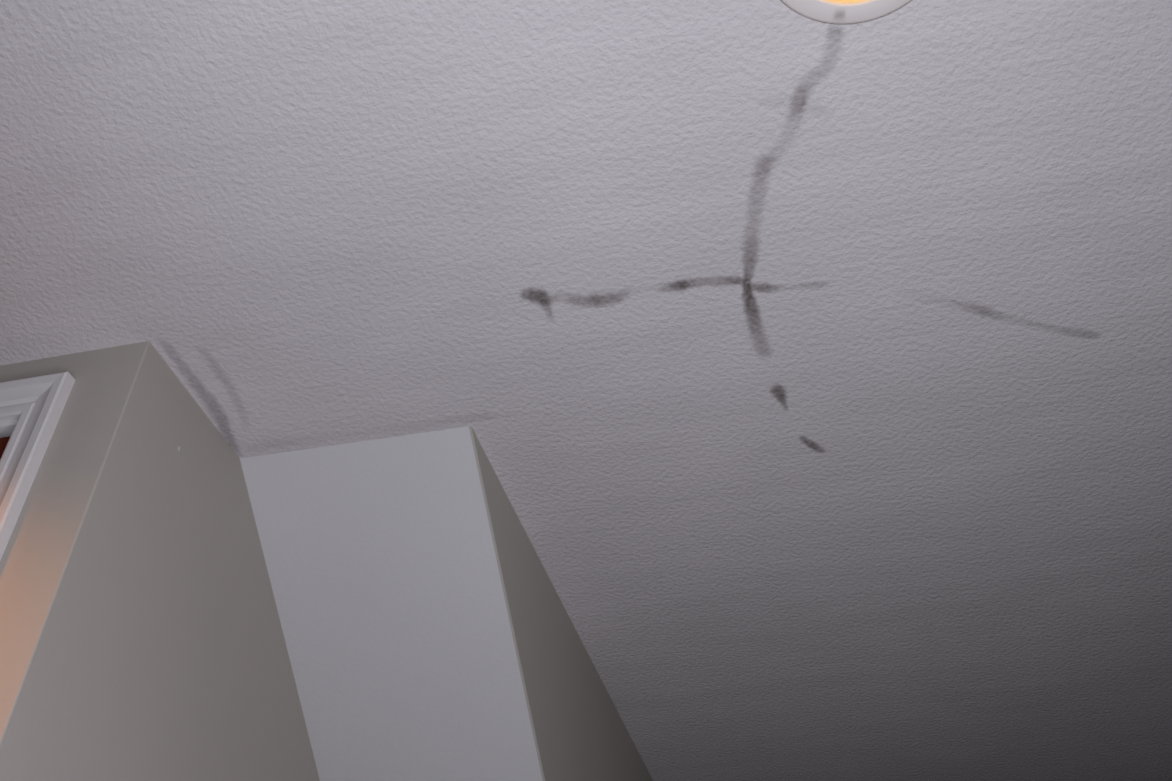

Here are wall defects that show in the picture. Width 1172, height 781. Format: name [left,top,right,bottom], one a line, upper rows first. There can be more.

crack [529,292,545,301]
crack [736,280,756,313]